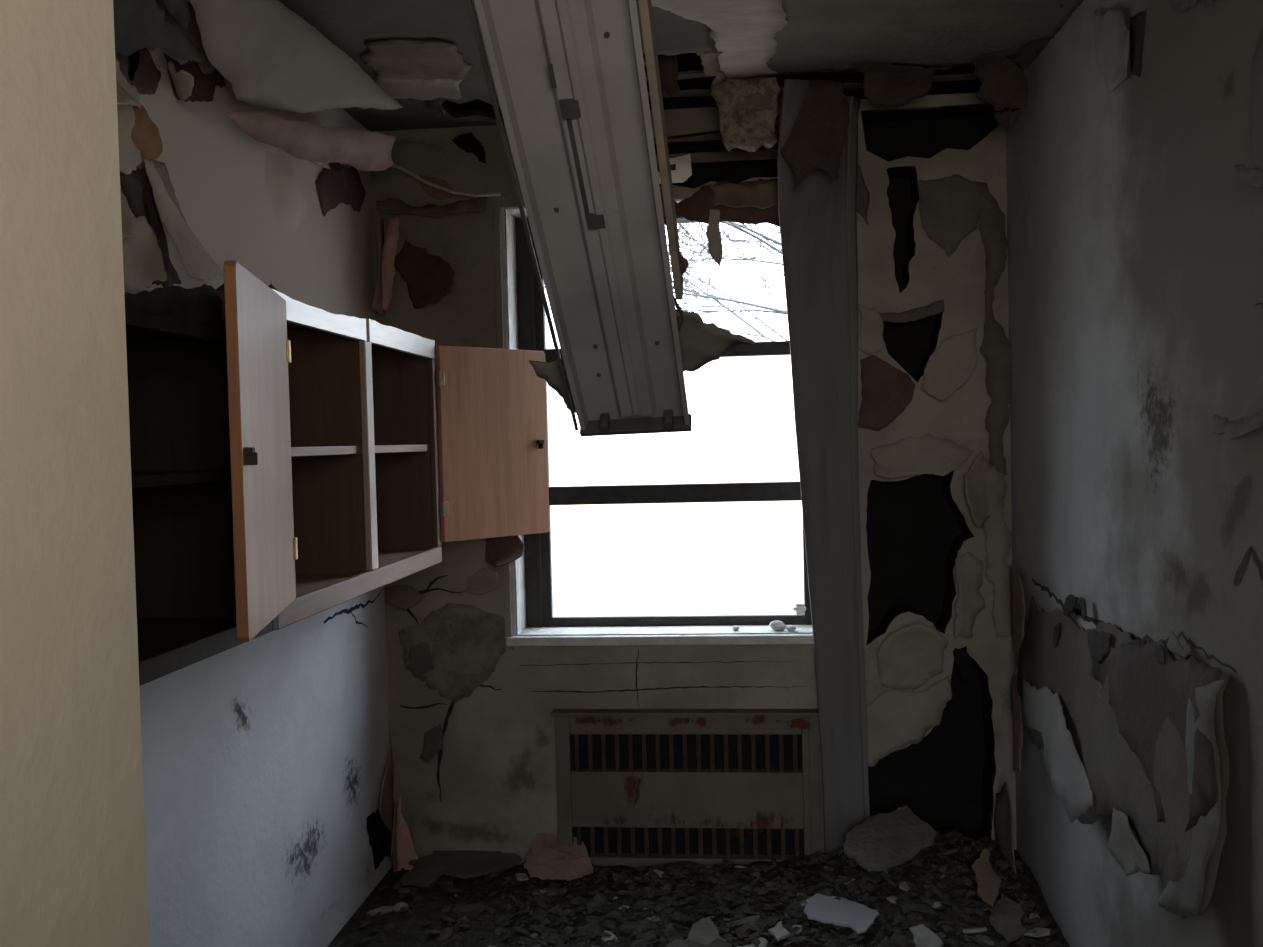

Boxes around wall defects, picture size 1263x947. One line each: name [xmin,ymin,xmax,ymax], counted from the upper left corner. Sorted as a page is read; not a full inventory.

peeling [113,0,488,311]
peeling [636,0,1231,918]
water stain [290,828,320,874]
crack [400,685,501,803]